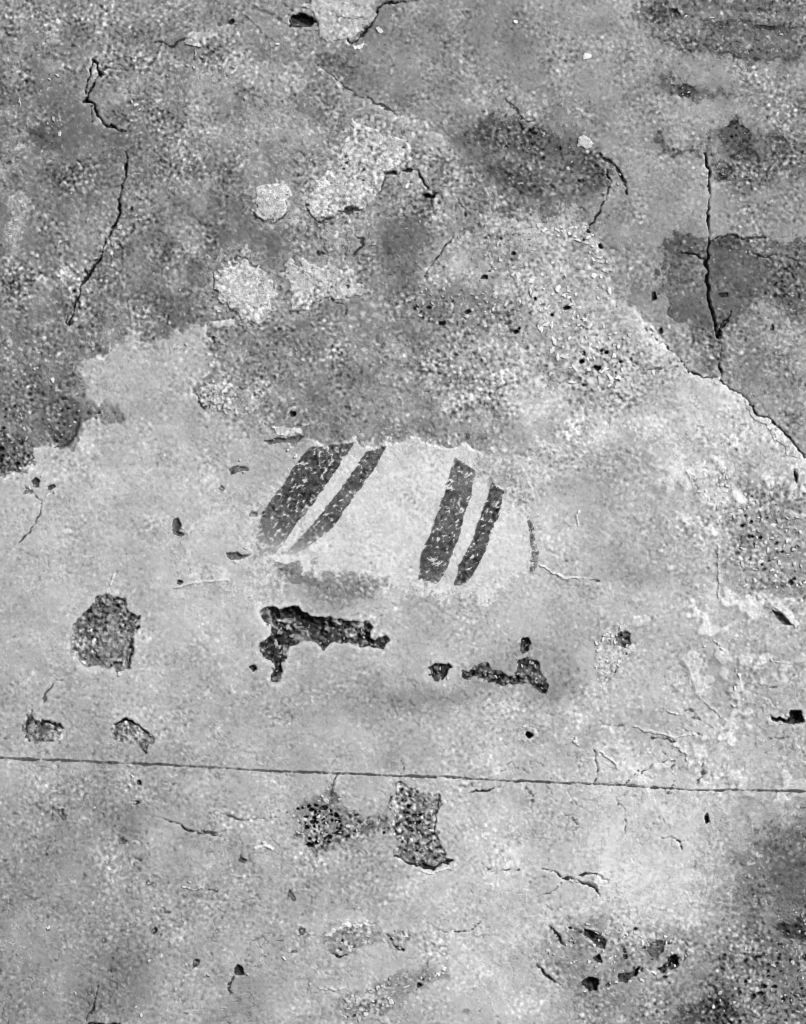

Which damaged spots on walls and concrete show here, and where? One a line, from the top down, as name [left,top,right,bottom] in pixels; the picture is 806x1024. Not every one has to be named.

damp [602,0,806,65]
crack [82,60,126,132]
damp [657,70,738,104]
crack [65,157,129,326]
damp [196,99,806,589]
crack [646,153,806,483]
damp [0,408,36,478]
flaking render [70,591,141,676]
spalling [428,661,543,689]
flaking render [22,710,64,744]
crack [0,736,806,833]
spalling [286,781,460,874]